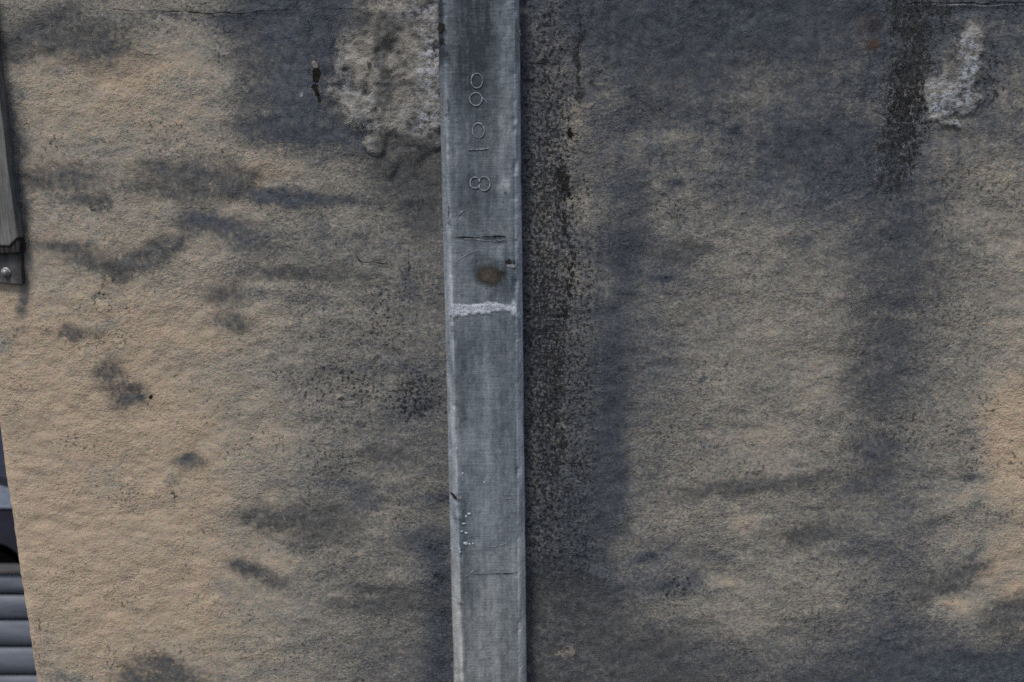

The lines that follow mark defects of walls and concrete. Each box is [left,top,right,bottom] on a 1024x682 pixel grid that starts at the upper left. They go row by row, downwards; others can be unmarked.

leakage [240,0,441,221]
leakage [572,7,586,102]
leakage [873,0,956,196]
leakage [10,114,111,230]
leakage [140,162,337,209]
leakage [42,213,252,283]
leakage [258,264,345,279]
leakage [550,165,577,463]